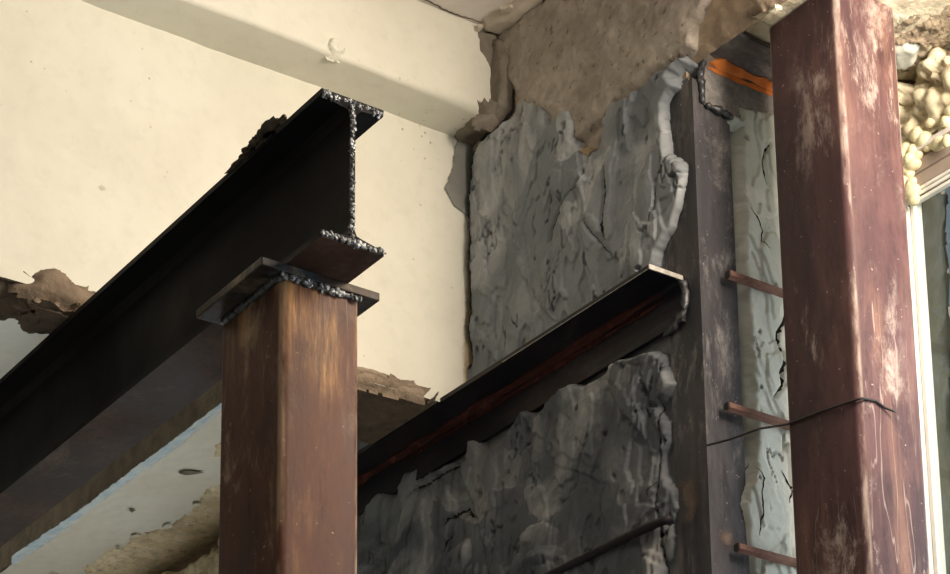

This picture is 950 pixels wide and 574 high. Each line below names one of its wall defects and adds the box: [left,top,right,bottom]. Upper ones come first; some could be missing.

crack [425,0,482,23]
flaking render [454,0,715,150]
flaking render [751,0,784,14]
flaking render [894,5,950,74]
flaking render [0,268,96,334]
crack [773,316,786,396]
rust [357,296,658,488]
peeling [83,484,220,574]
crack [742,463,793,534]